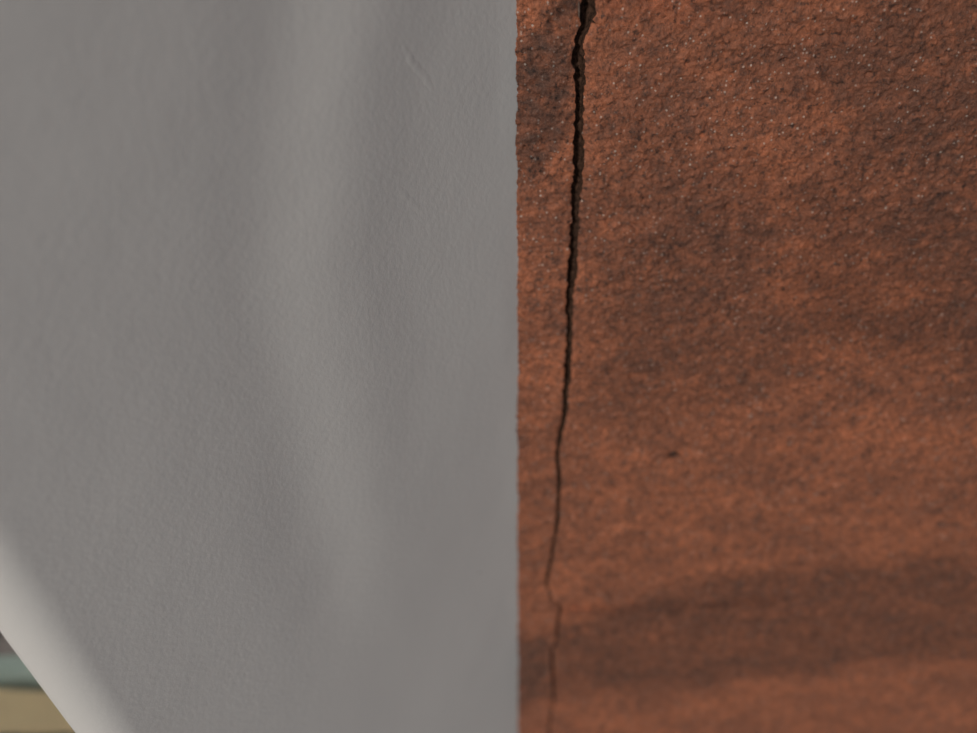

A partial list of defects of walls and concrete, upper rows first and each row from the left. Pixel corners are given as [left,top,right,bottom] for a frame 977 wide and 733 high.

crack [545,0,597,733]